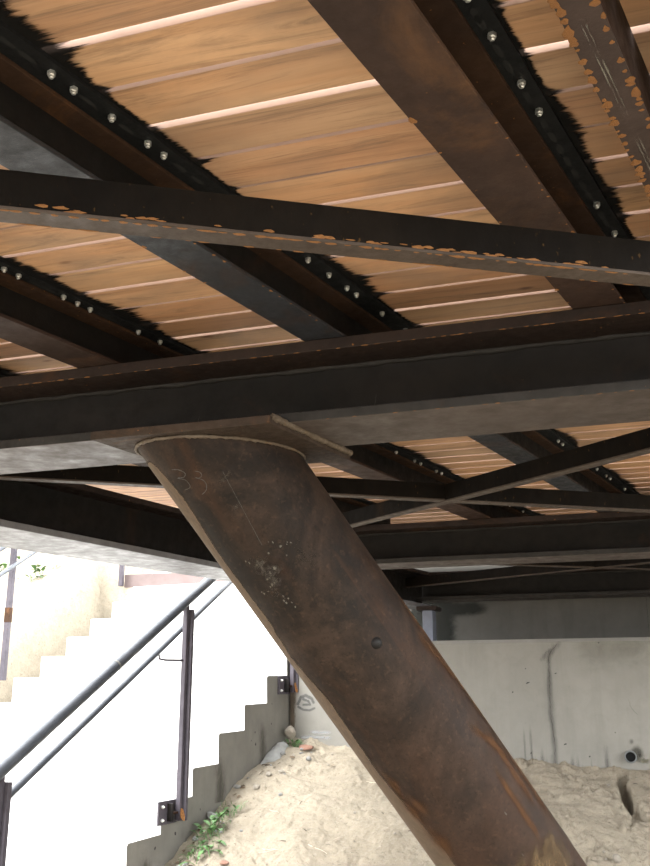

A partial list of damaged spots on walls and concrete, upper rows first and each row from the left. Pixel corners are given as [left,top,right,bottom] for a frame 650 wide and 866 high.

corrosion [547,0,650,202]
corrosion [0,204,632,285]
corrosion [147,461,456,866]
corrosion [387,578,569,839]